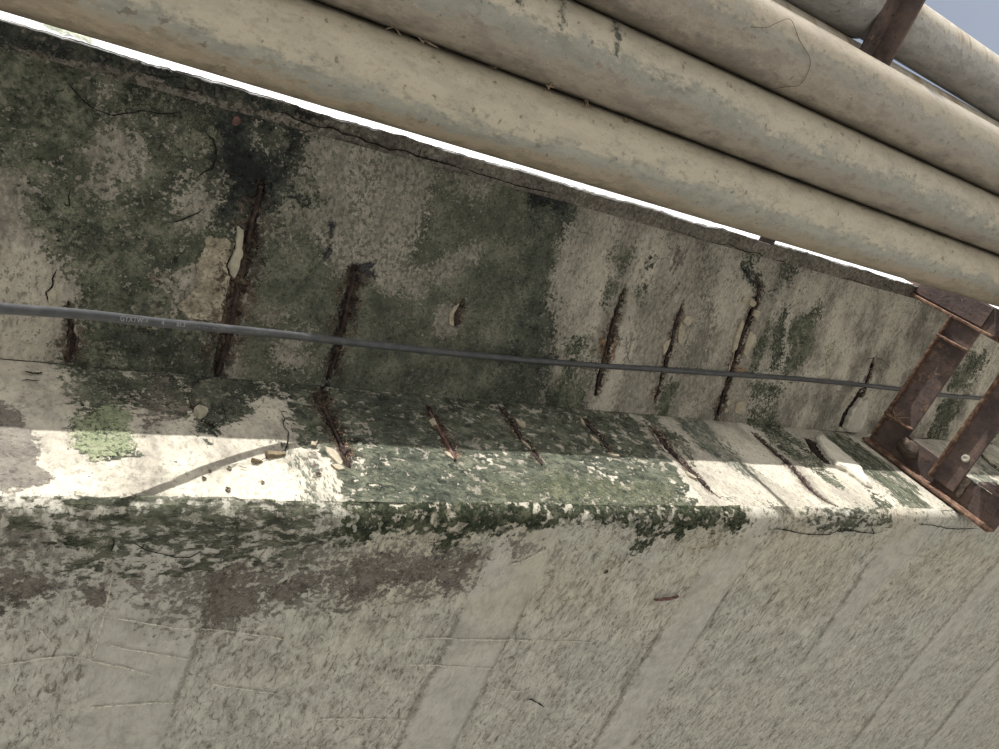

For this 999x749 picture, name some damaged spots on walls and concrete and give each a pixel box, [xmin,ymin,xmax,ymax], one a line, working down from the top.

crack [67,72,199,116]
damp [0,21,326,282]
damp [526,193,569,218]
damp [323,221,338,260]
damp [742,266,764,294]
damp [322,261,377,387]
peeling [251,444,289,464]
peeling [804,435,873,489]
crack [780,523,882,535]